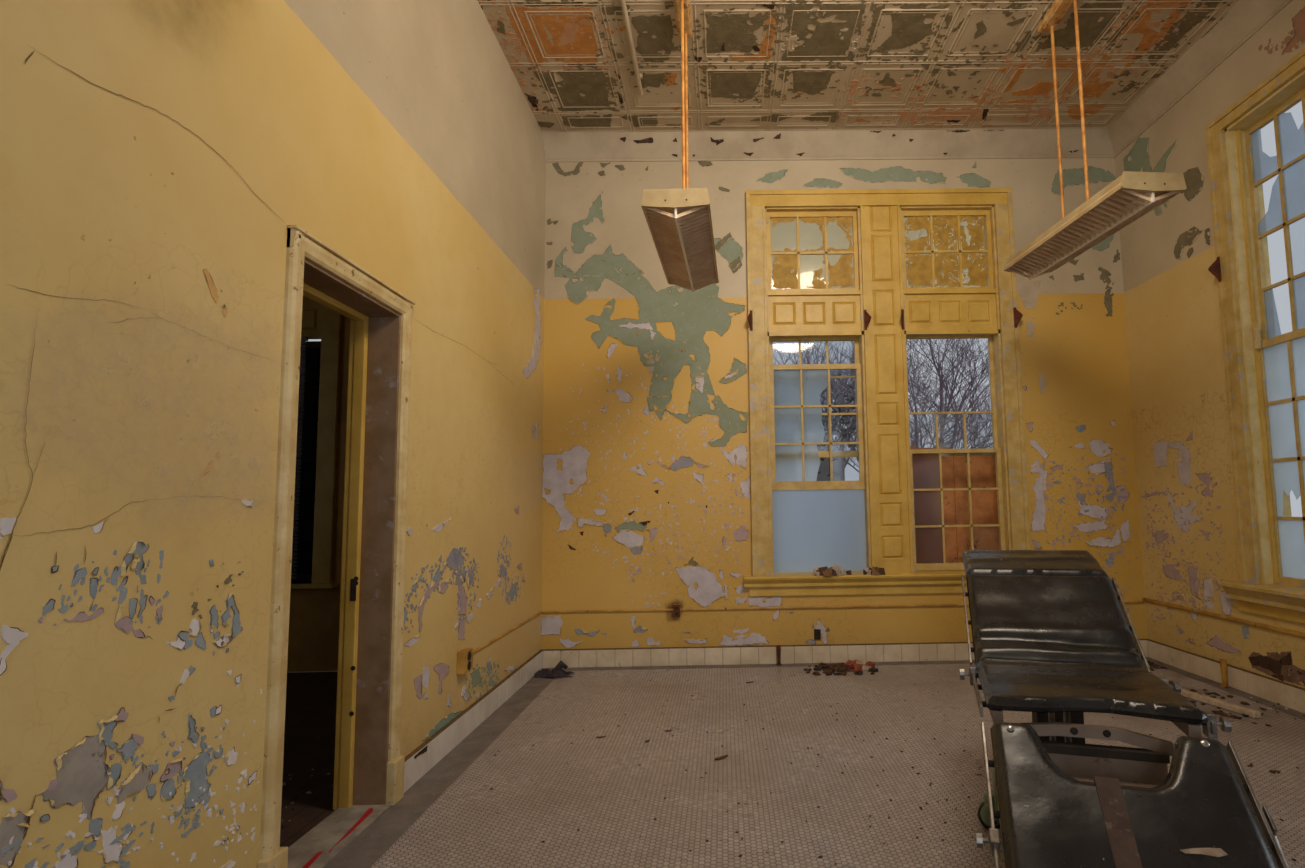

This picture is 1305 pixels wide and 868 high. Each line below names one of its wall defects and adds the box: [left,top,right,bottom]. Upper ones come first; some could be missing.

crack [25,45,283,221]
peeling [478,0,1231,167]
peeling [1069,233,1120,316]
peeling [1050,137,1179,195]
peeling [1153,167,1204,216]
peeling [1174,226,1210,260]
crack [0,284,274,570]
peeling [541,194,794,648]
peeling [0,540,244,675]
peeling [404,535,525,647]
peeling [1026,423,1305,687]
peeling [414,656,516,759]